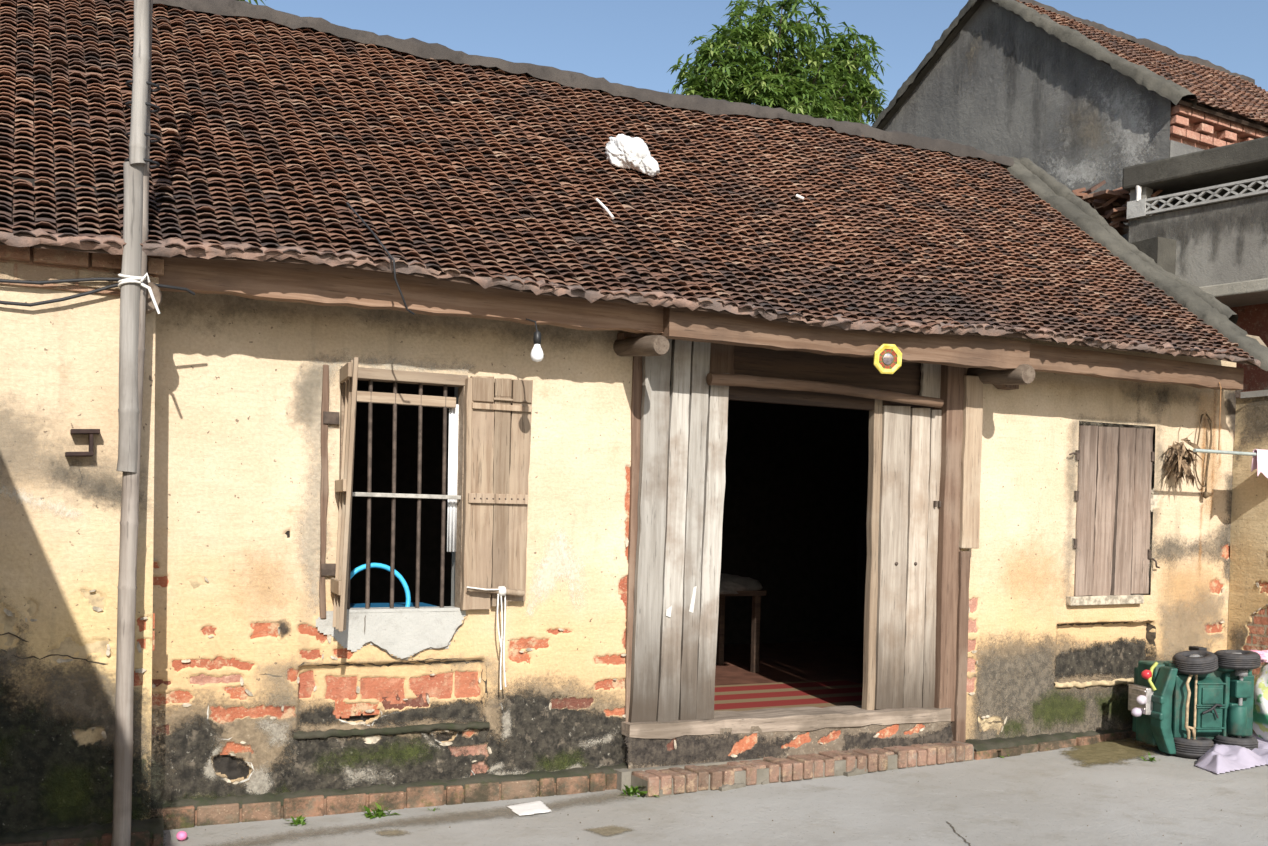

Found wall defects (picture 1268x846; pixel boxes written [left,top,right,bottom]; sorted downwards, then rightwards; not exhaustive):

leakage [52,462,122,505]
spalling [153,558,169,587]
spalling [1209,579,1225,594]
crack [0,632,106,665]
spalling [508,628,572,664]
spalling [549,576,627,718]
spalling [1243,581,1268,680]
leakage [970,634,1172,767]
leakage [0,628,116,835]
spalling [204,741,273,794]
leakage [131,677,629,835]
leakage [586,826,632,836]